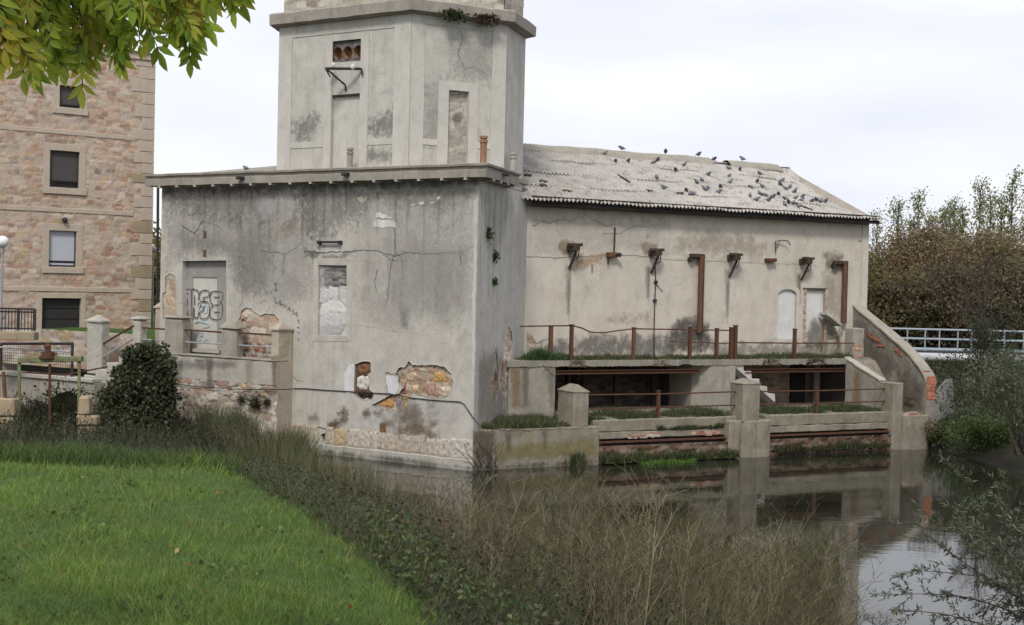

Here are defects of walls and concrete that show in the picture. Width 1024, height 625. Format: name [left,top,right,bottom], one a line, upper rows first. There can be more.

crack [261,212,471,310]
spalling [238,307,281,357]
spalling [344,360,455,434]
spalling [490,326,513,403]
leakage [540,319,789,357]
flaking render [923,371,936,400]